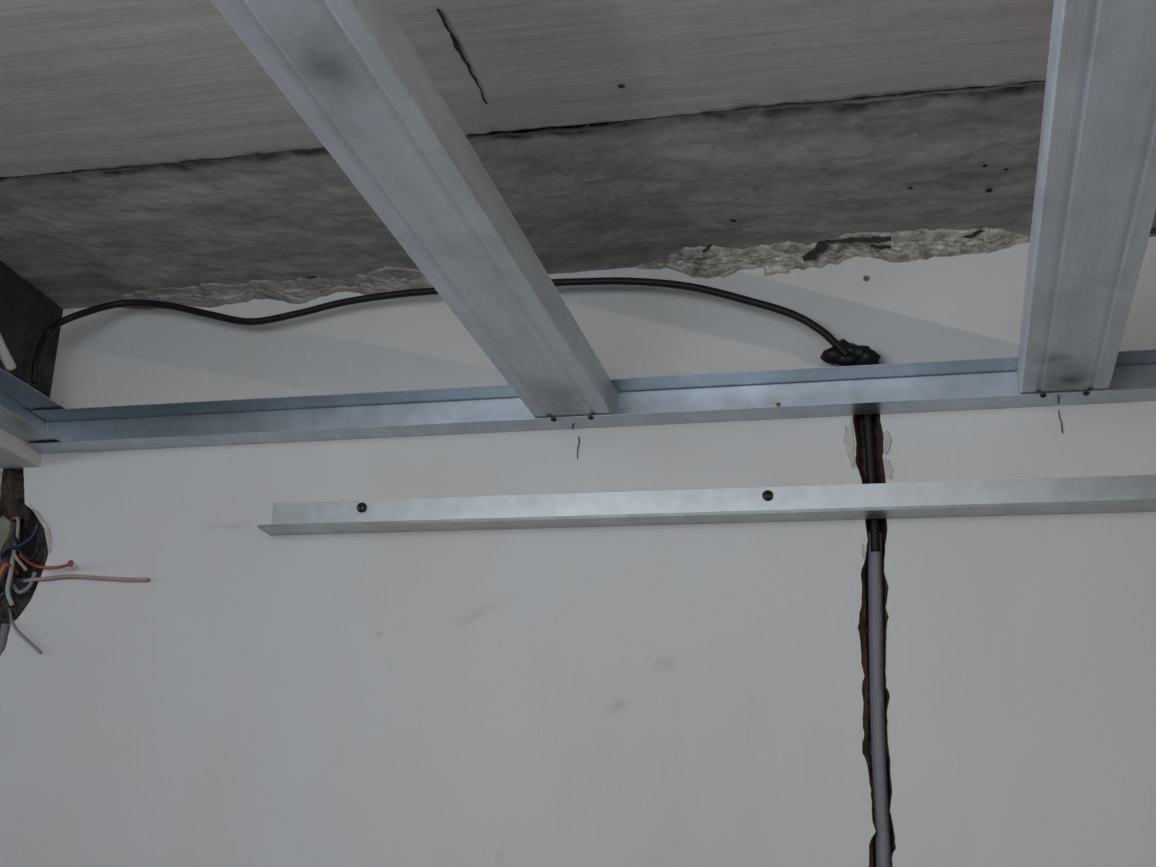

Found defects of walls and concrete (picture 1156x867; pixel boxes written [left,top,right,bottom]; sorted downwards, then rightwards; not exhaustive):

peeling [0,148,433,309]
peeling [465,80,1046,279]